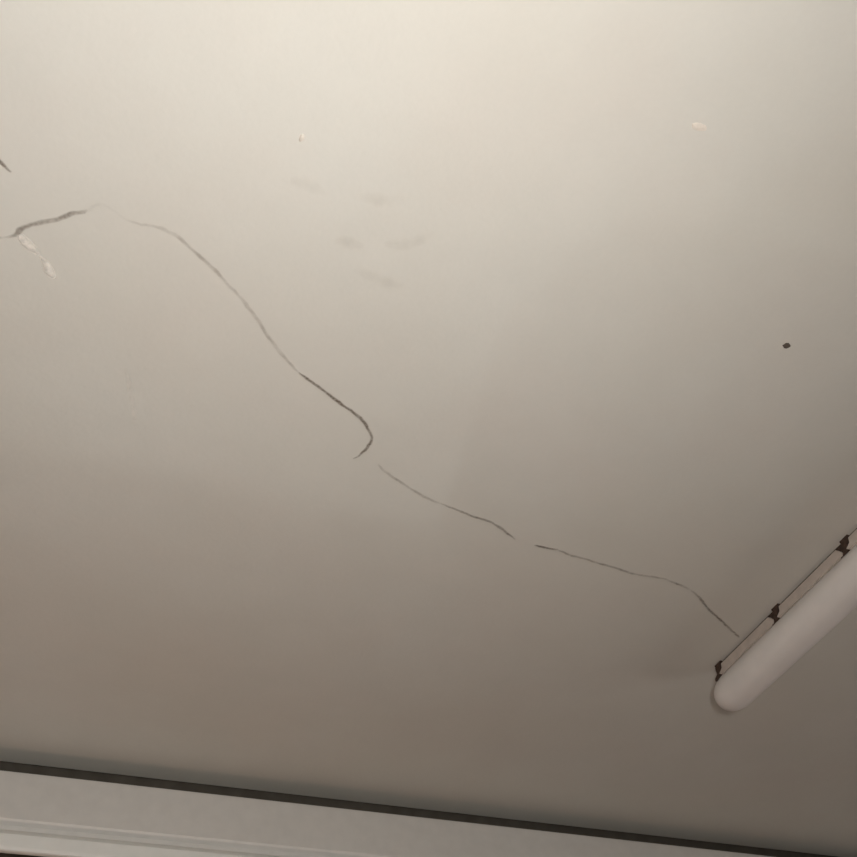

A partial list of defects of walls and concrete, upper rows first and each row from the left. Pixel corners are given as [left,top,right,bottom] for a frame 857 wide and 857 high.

crack [304,376,372,453]